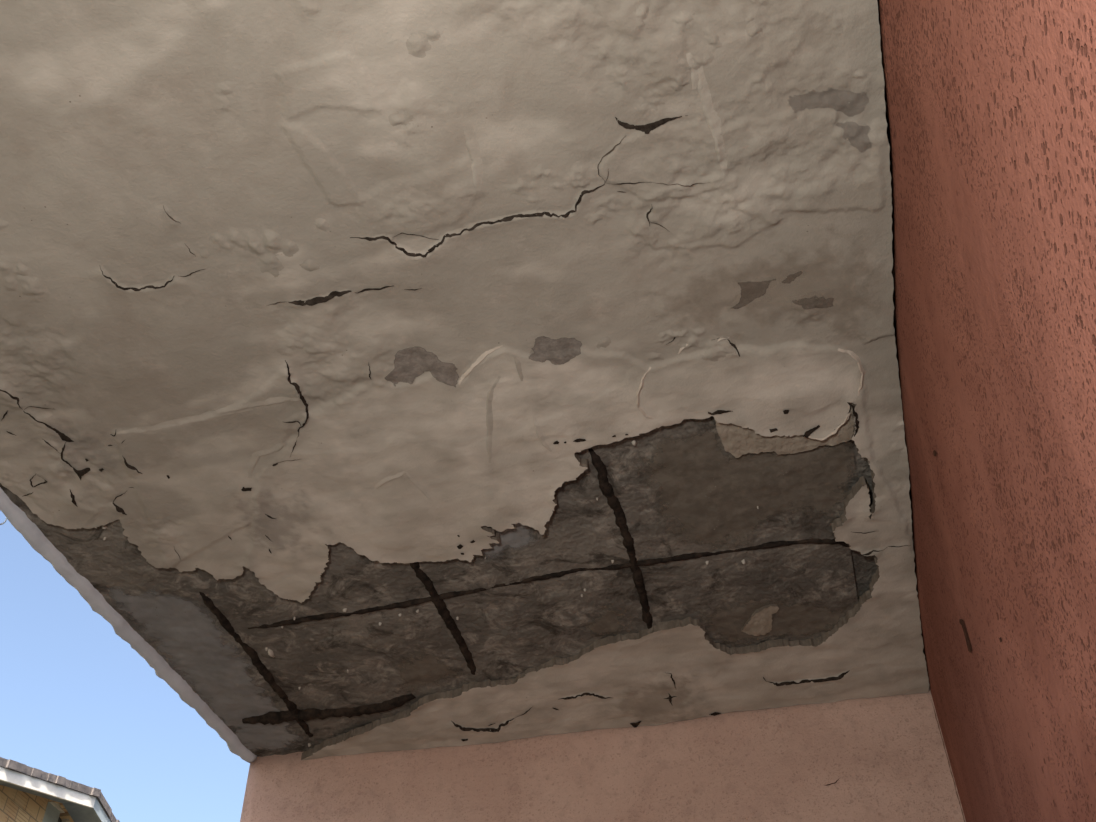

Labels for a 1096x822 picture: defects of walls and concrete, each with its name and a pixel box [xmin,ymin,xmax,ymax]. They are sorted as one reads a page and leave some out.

crack [350,140,700,257]
crack [100,206,203,291]
crack [267,286,421,306]
peeling [733,271,802,309]
peeling [792,296,833,309]
peeling [529,336,582,365]
crack [278,360,309,463]
spalling [0,345,865,757]
crack [763,671,849,686]
crack [453,693,611,732]